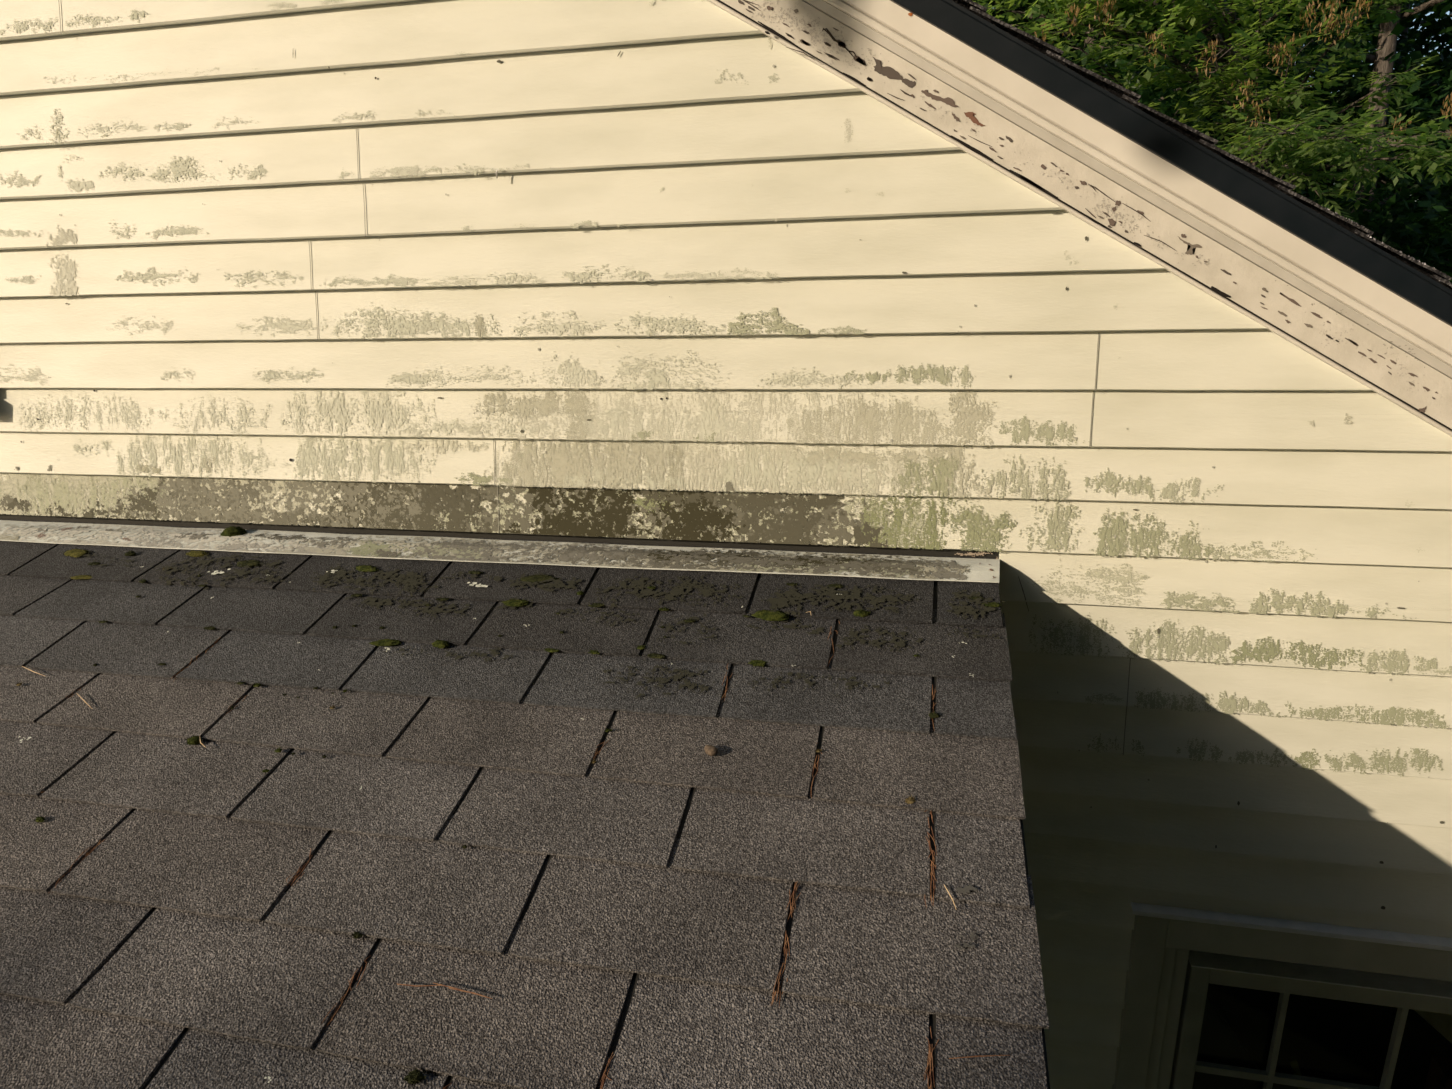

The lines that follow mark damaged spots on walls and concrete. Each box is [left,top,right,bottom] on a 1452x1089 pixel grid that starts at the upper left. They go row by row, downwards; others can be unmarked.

peeling [738,0,985,139]
peeling [1097,201,1144,248]
peeling [1178,234,1236,284]
peeling [1260,287,1438,413]
water stain [0,267,970,580]